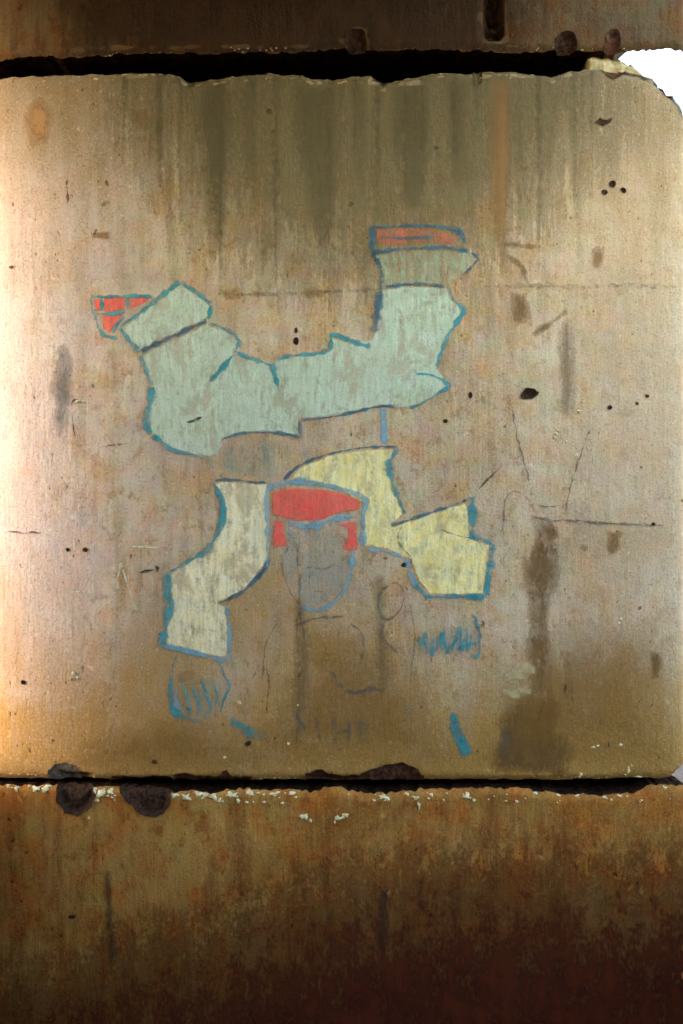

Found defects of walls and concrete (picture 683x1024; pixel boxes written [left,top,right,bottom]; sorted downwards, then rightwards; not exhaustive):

damp [122,70,597,278]
crack [479,410,662,532]
damp [6,773,52,794]
damp [93,787,116,802]
damp [171,777,297,804]